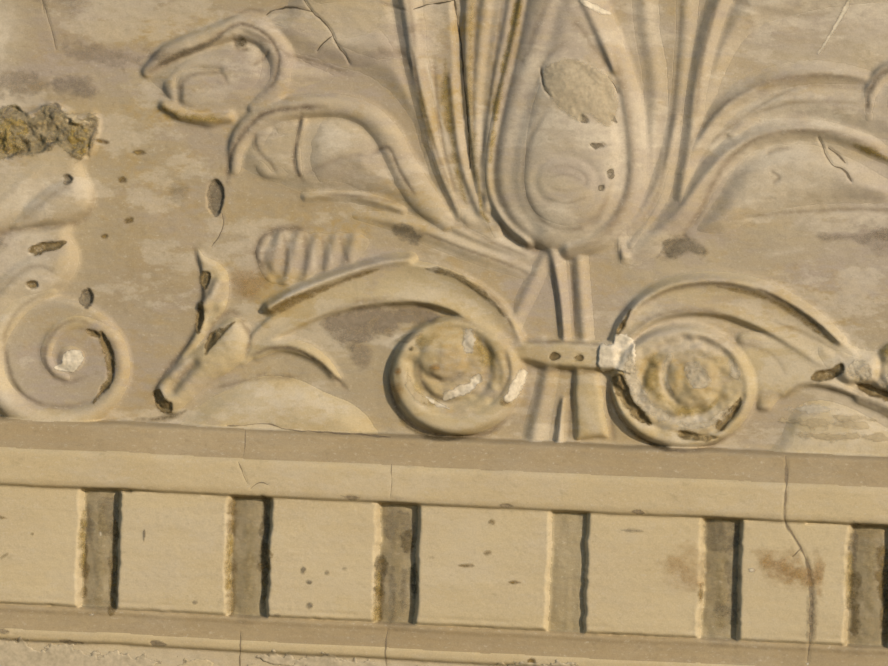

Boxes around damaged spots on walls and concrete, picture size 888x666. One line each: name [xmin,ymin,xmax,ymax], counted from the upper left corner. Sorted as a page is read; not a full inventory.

crack [267,0,349,62]
crack [415,0,470,157]
spalling [0,104,108,160]
spalling [200,271,211,289]
spalling [195,302,235,354]
spalling [87,329,115,403]
spalling [153,389,173,414]
spalling [611,353,670,425]
spalling [678,397,741,441]
crack [784,463,813,656]